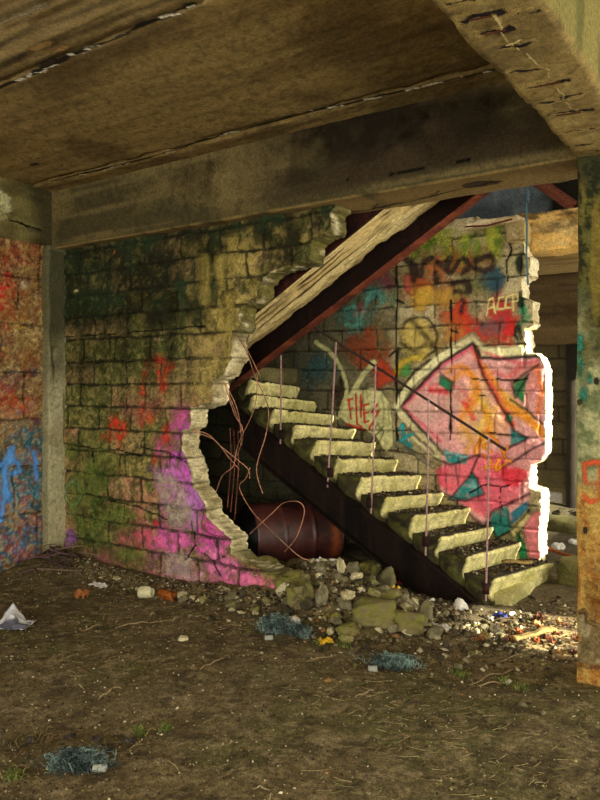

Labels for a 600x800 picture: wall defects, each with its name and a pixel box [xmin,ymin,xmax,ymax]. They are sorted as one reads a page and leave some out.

crack [0,2,197,89]
crack [493,15,572,109]
crack [52,69,495,182]